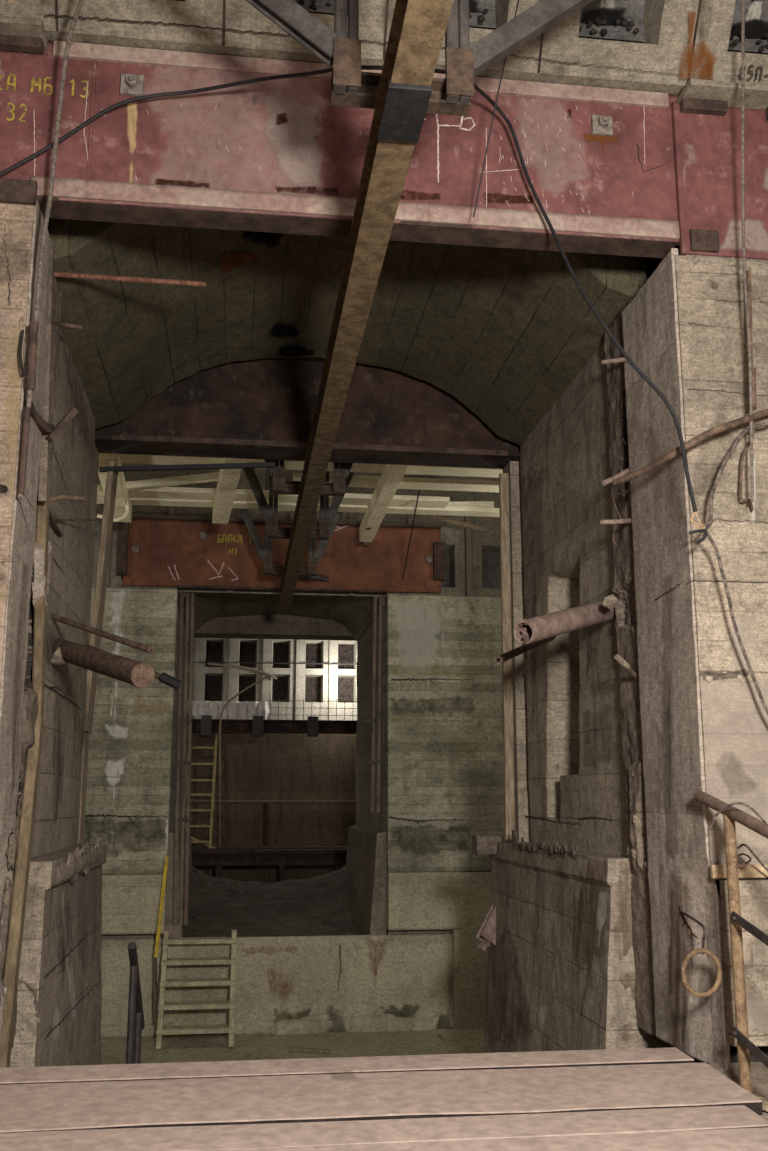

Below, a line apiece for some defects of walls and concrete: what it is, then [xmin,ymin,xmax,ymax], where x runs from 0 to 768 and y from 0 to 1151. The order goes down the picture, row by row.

rust [680,11,715,80]
spalling [24,568,35,691]
damp [109,589,126,655]
damp [105,681,130,738]
damp [105,758,125,807]